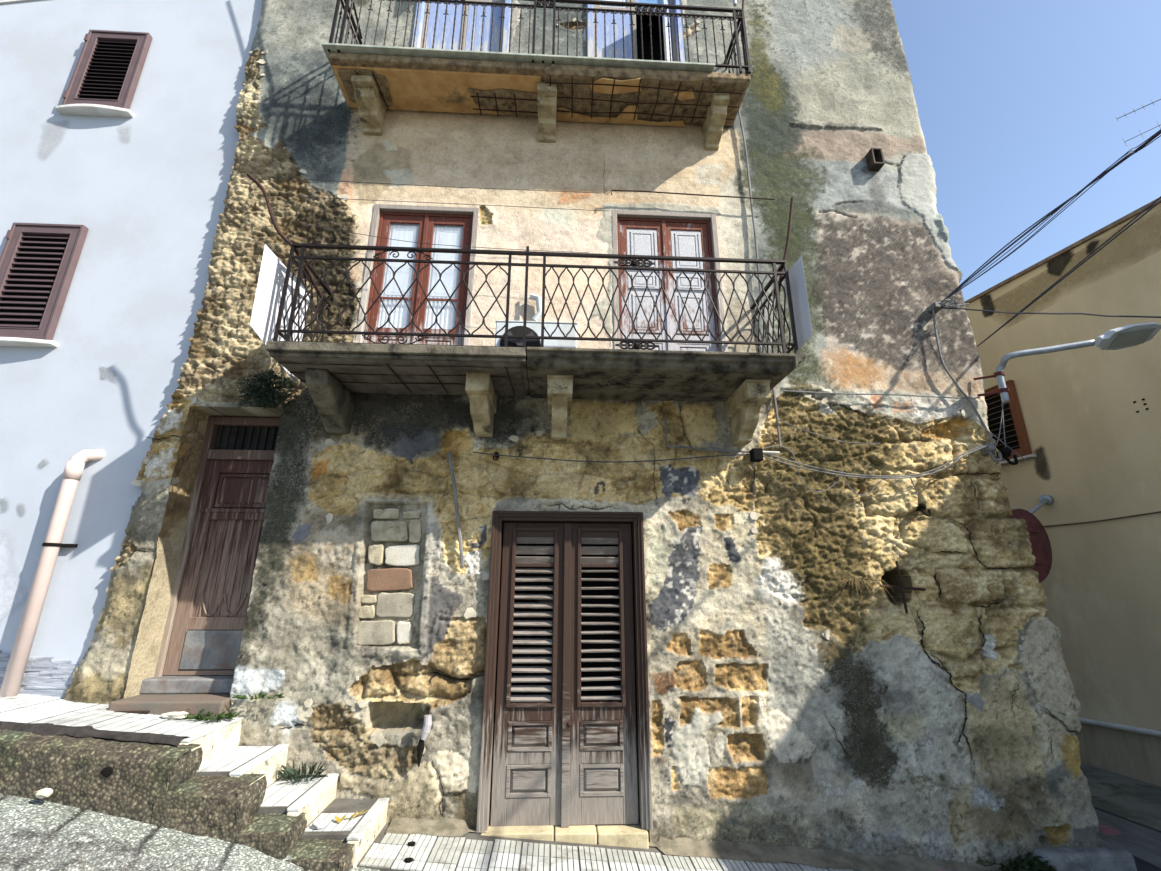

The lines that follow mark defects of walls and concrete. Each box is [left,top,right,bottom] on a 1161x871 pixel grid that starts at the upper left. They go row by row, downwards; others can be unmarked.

spalling [468,88,538,117]
spalling [545,74,745,124]
water stain [740,63,804,162]
water stain [262,77,360,338]
spalling [131,49,524,488]
water stain [761,198,819,269]
water stain [980,213,1161,319]
spalling [297,392,1047,799]
crack [916,463,1027,778]
water stain [816,642,899,810]
water stain [653,808,863,854]